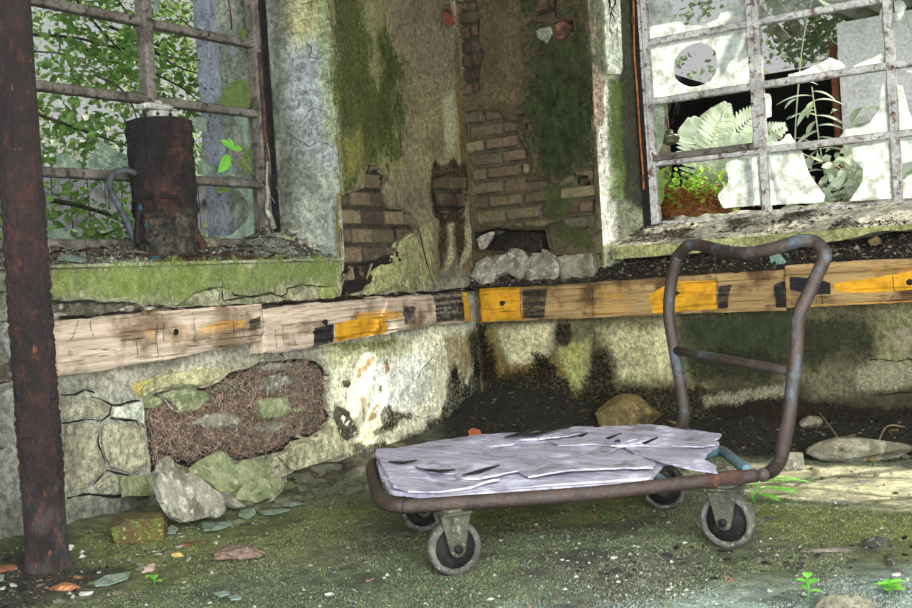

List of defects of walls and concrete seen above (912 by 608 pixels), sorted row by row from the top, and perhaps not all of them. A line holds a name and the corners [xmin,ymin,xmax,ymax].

spalling [440,0,486,96]
damp [517,0,625,249]
spalling [326,163,419,297]
spalling [433,109,597,268]
crack [175,265,333,307]
crack [61,389,150,500]
spalling [139,354,360,475]
damp [353,405,412,455]
damp [401,323,678,440]
damp [686,311,791,420]
crack [869,356,912,364]
crack [870,389,912,397]